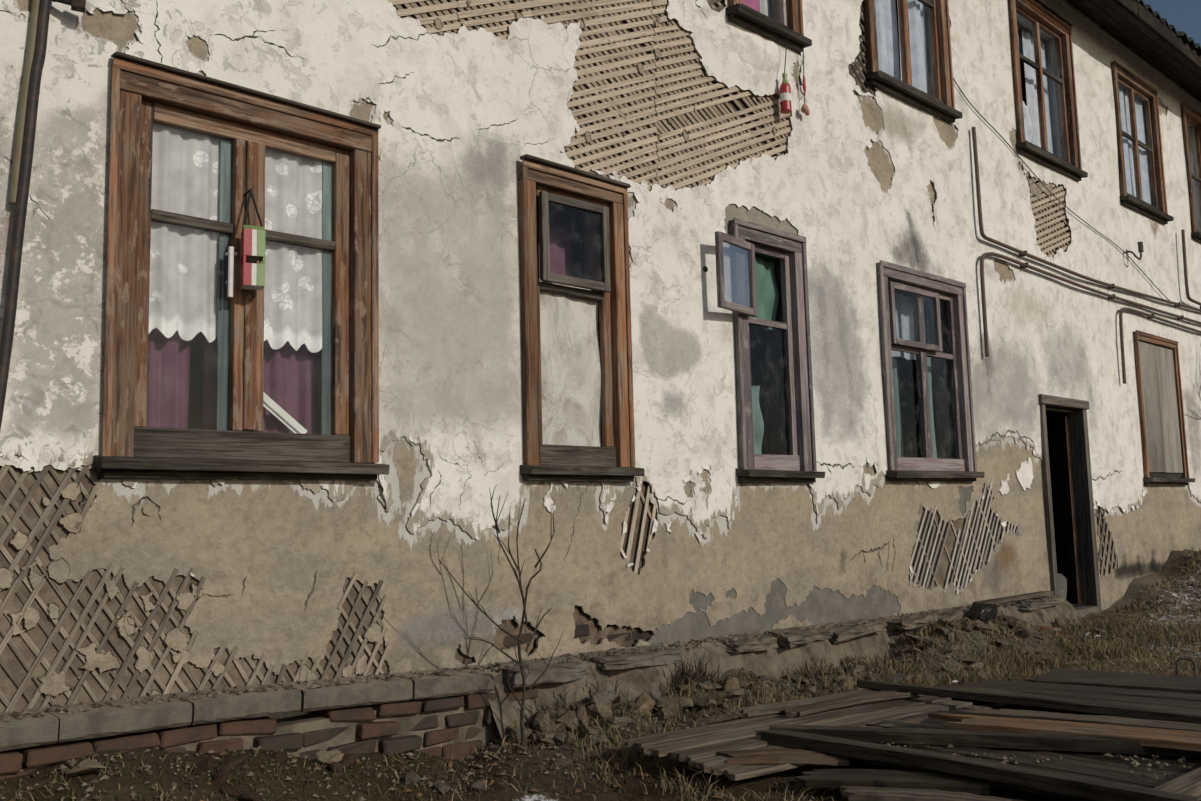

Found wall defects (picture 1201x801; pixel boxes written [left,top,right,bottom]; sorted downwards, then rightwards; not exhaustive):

crack [215,30,304,59]
crack [372,32,429,48]
peeling [348,93,399,128]
crack [399,118,550,146]
spalling [388,0,806,226]
peeling [848,0,896,194]
spalling [724,204,798,235]
spalling [1009,126,1072,259]
crack [378,474,388,513]
crack [429,441,506,510]
peeling [0,434,1051,713]
peeling [1094,481,1201,611]